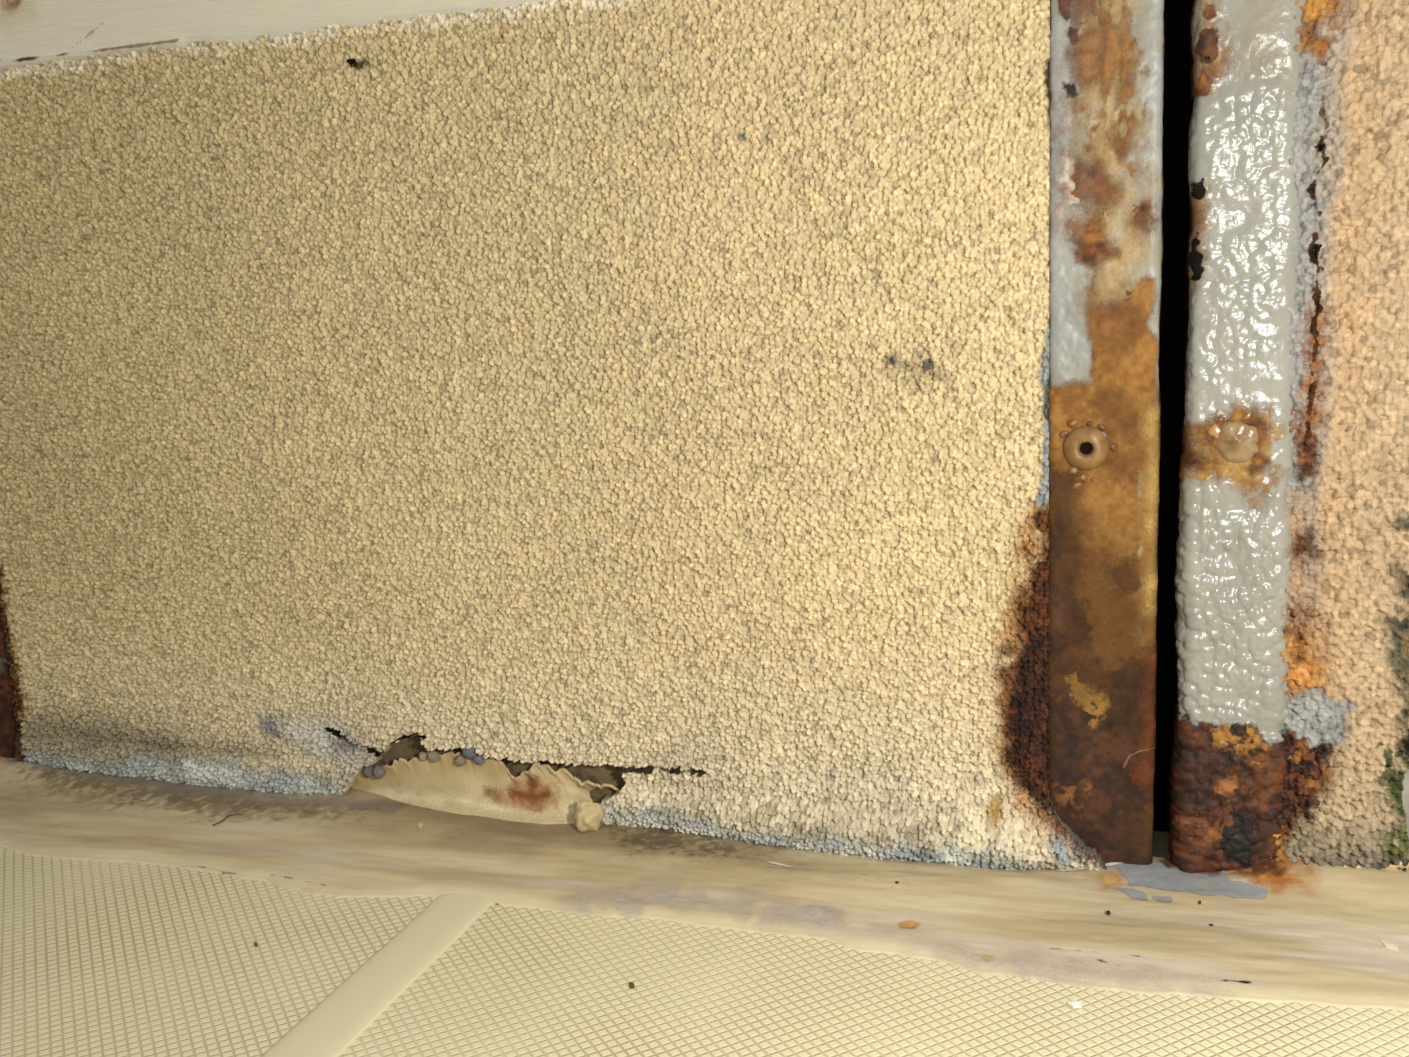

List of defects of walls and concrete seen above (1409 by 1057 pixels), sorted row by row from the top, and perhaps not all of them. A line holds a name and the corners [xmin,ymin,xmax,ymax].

rust [1296,0,1341,58]
rust [987,0,1334,892]
rust [0,568,26,763]
spalling [352,733,626,832]